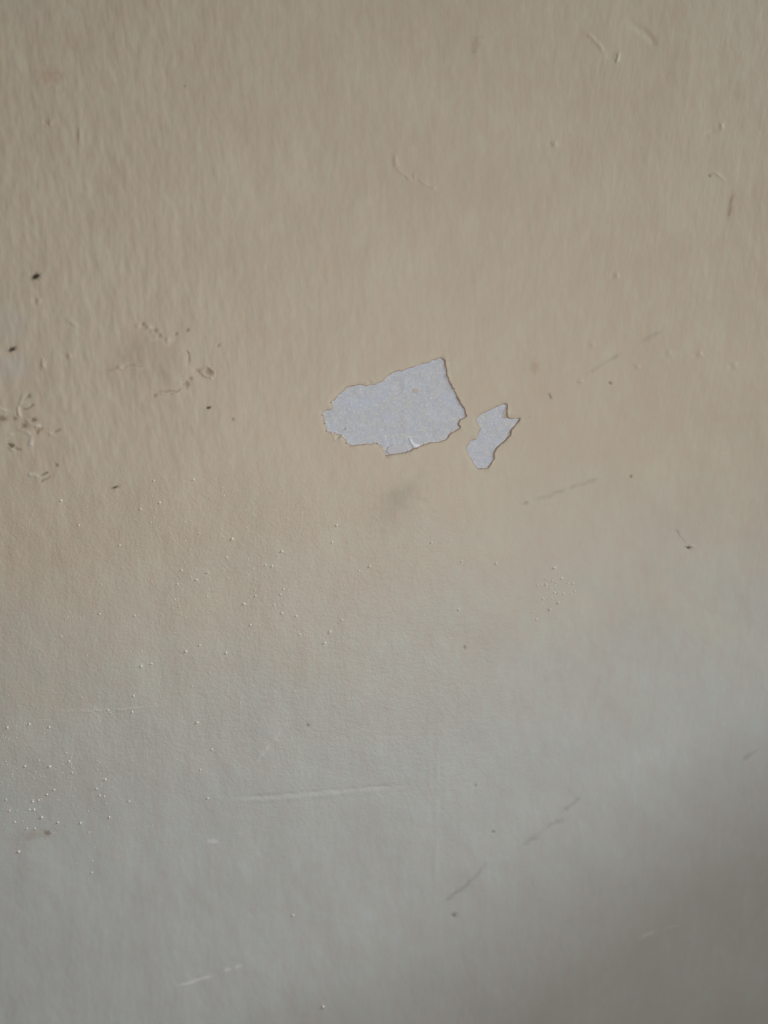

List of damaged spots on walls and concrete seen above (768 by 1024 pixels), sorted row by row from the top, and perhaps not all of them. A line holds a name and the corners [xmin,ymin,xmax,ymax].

peeling [316,350,532,475]